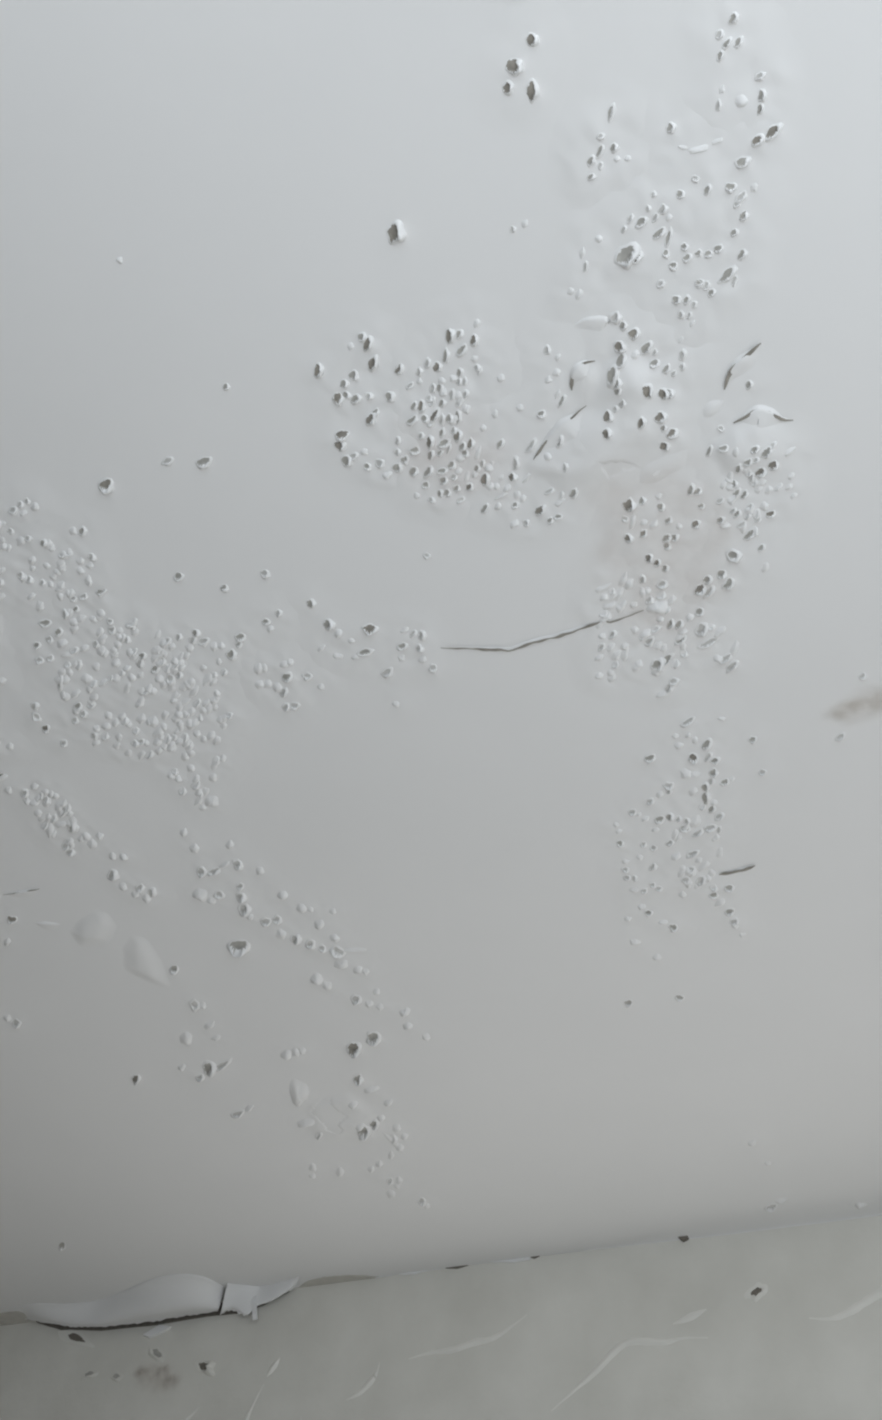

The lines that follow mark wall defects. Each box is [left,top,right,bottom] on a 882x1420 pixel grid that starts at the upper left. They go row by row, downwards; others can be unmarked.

crack [443,610,644,652]
crack [719,864,756,875]
peeling [0,1274,379,1348]